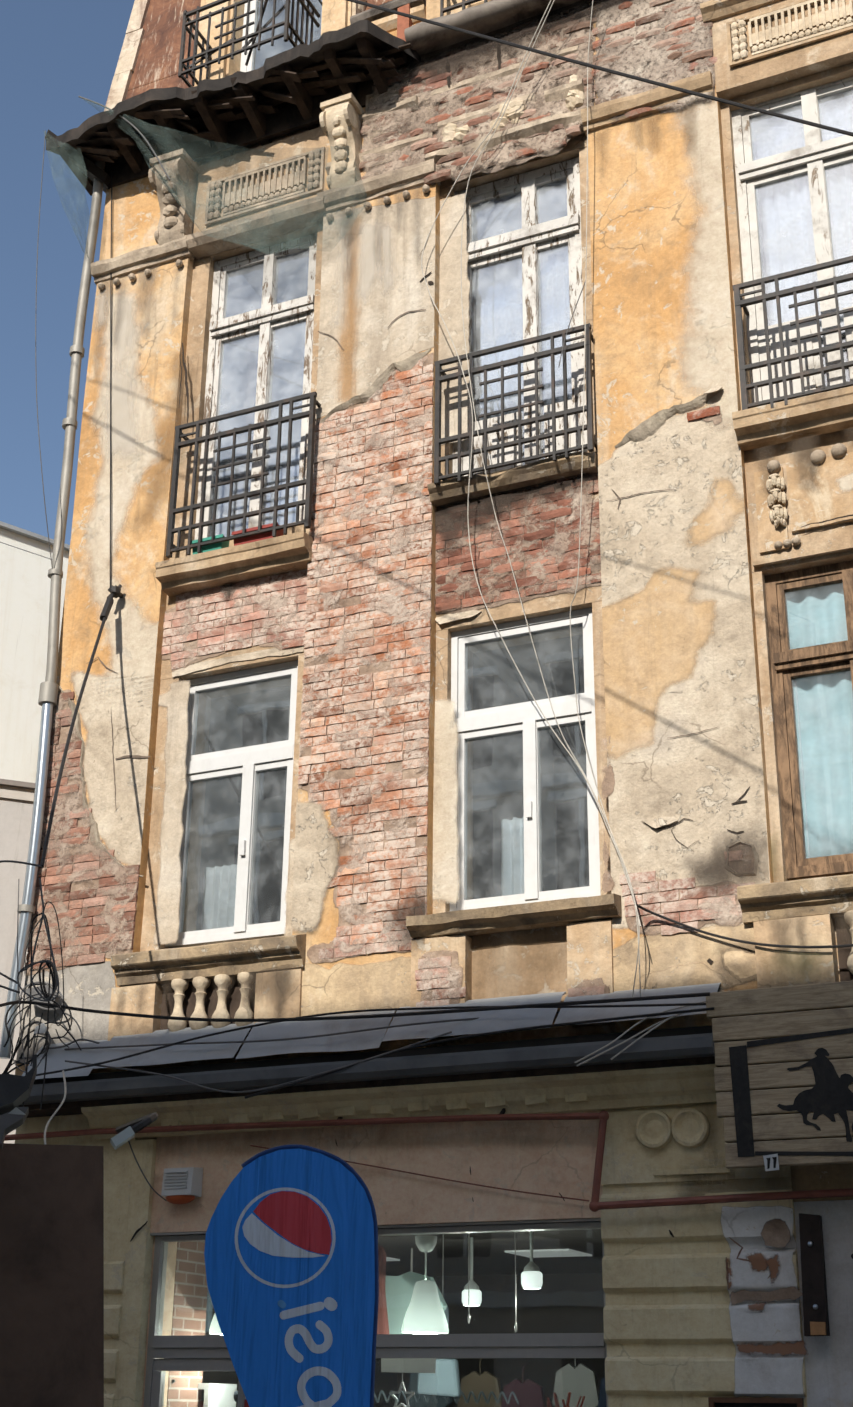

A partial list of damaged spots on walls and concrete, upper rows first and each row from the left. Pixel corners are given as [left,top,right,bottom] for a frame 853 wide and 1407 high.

flaking render [24,0,770,1016]
flaking render [837,473,853,491]
crack [643,786,750,848]
flaking render [721,1206,805,1398]